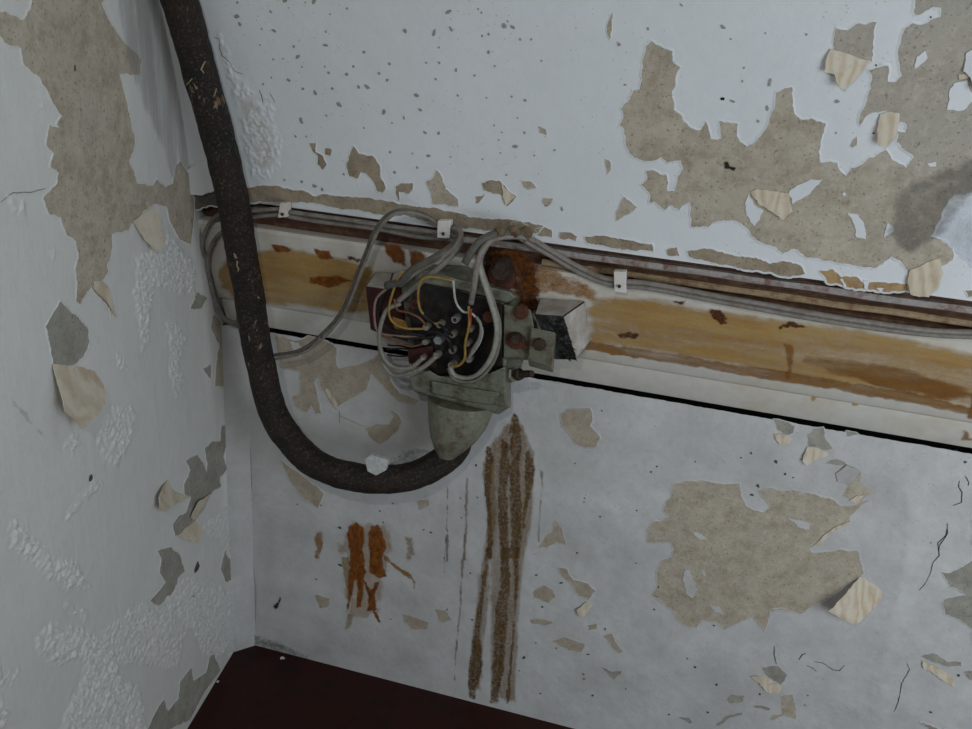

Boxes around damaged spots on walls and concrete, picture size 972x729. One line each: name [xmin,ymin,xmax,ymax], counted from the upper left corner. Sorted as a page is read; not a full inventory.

peeling [247,0,972,297]
peeling [0,0,218,429]
peeling [190,291,224,388]
rust [483,247,972,419]
peeling [773,418,795,446]
peeling [150,424,227,607]
peeling [220,550,231,583]
rust [342,523,415,624]
peeling [645,426,882,633]
peeling [940,559,972,644]
peeling [147,652,221,729]